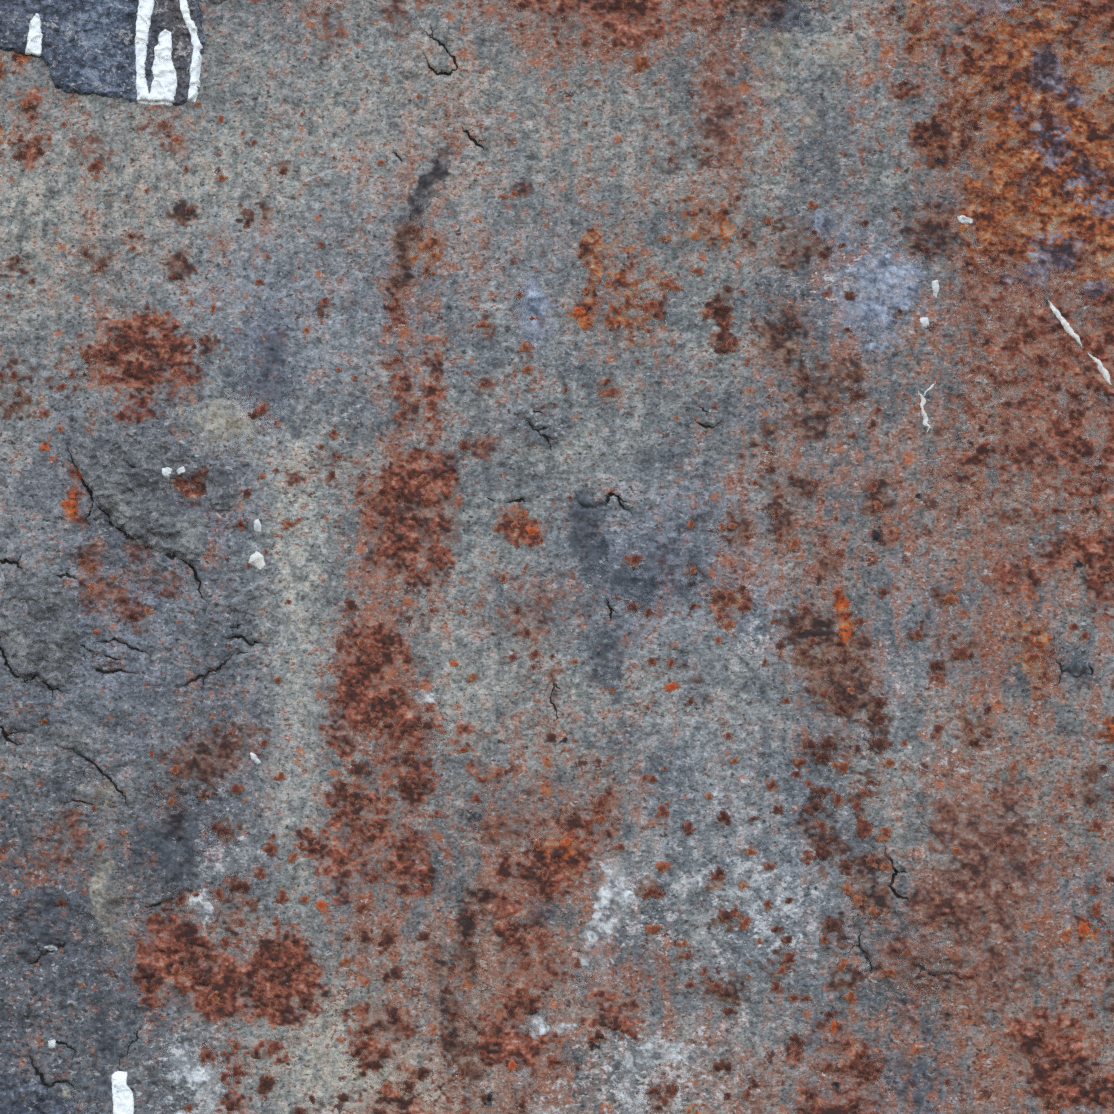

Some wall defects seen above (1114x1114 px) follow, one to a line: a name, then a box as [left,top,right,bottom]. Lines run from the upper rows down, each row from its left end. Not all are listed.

peeling [0,0,226,107]
rust [888,0,1114,700]
rust [699,285,882,551]
crack [67,444,209,604]
peeling [73,435,239,564]
peeling [0,567,79,687]
crack [80,637,150,676]
crack [174,624,260,688]
crack [64,748,128,808]
rust [134,596,626,1114]
rust [754,535,1114,1114]
peeling [0,1076,81,1114]